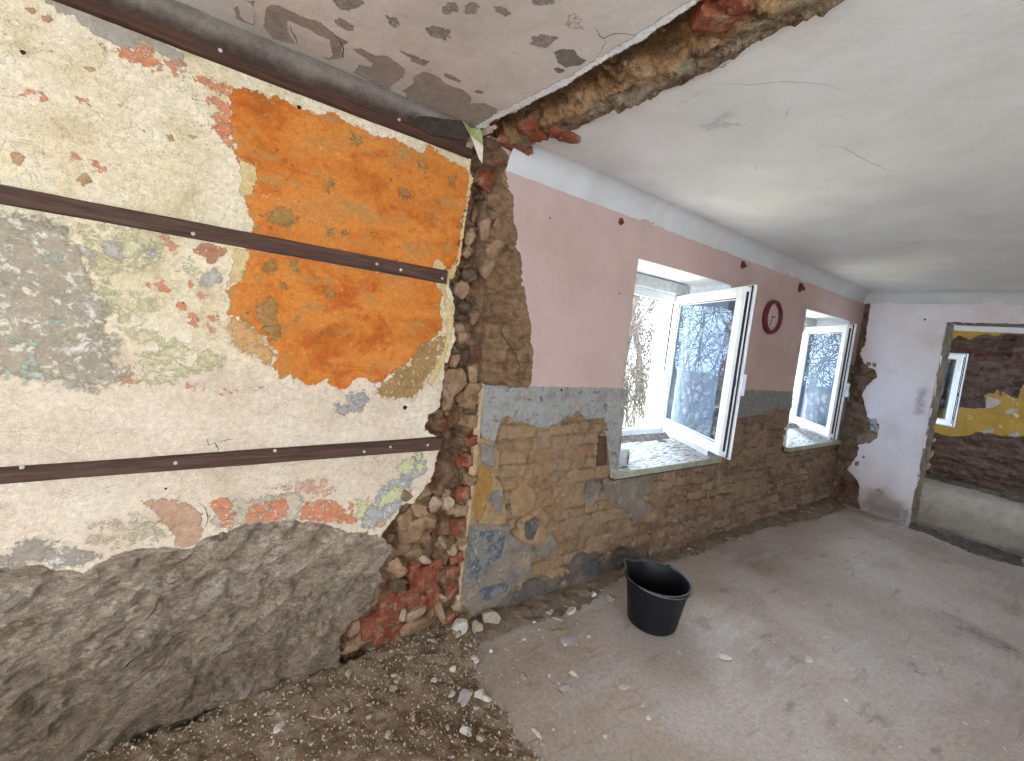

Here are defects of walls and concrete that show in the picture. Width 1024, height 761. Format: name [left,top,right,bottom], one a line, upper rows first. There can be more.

peeling [0,0,697,399]
spalling [0,452,428,761]
spalling [451,605,501,635]
flaking render [478,166,879,586]
flaking render [926,427,1024,497]
flaking render [938,333,1024,415]